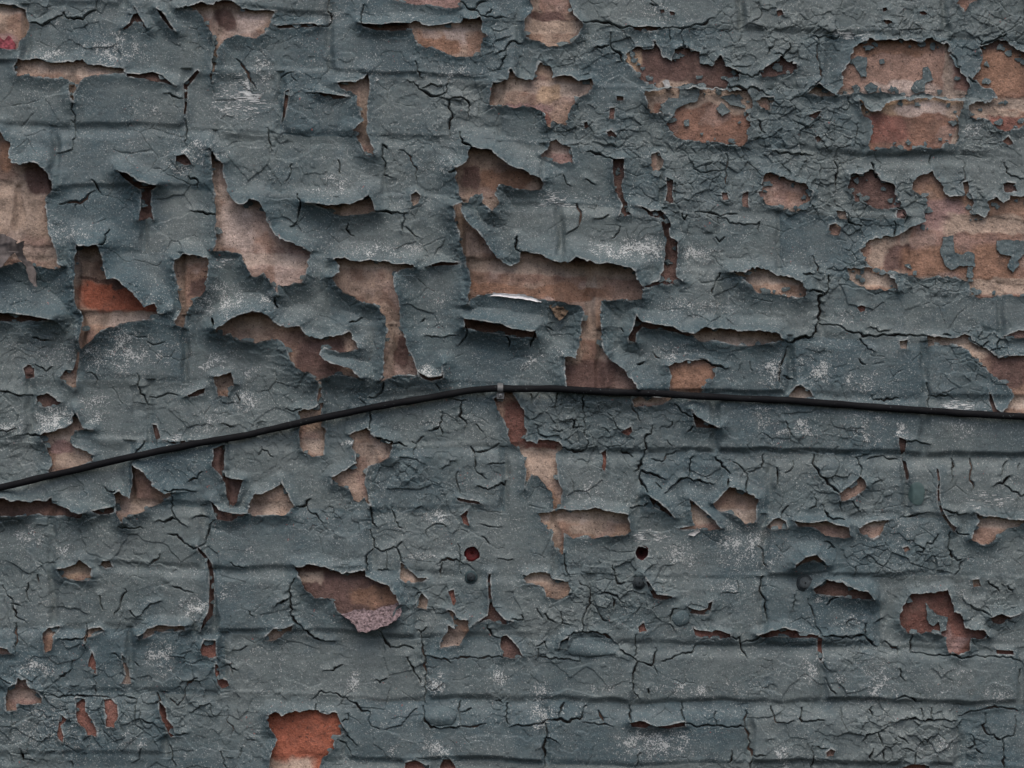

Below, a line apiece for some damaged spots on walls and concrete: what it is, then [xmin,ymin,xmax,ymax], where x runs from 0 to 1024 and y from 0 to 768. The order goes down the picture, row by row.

peeling [809,38,1024,151]
peeling [0,132,61,287]
peeling [174,151,311,327]
peeling [432,147,719,407]
crack [778,267,914,382]
peeling [847,169,1024,298]
crack [621,407,725,486]
crack [746,458,840,519]
peeling [295,564,402,633]
crack [382,628,492,729]
crack [507,703,605,762]
crack [812,598,1020,767]